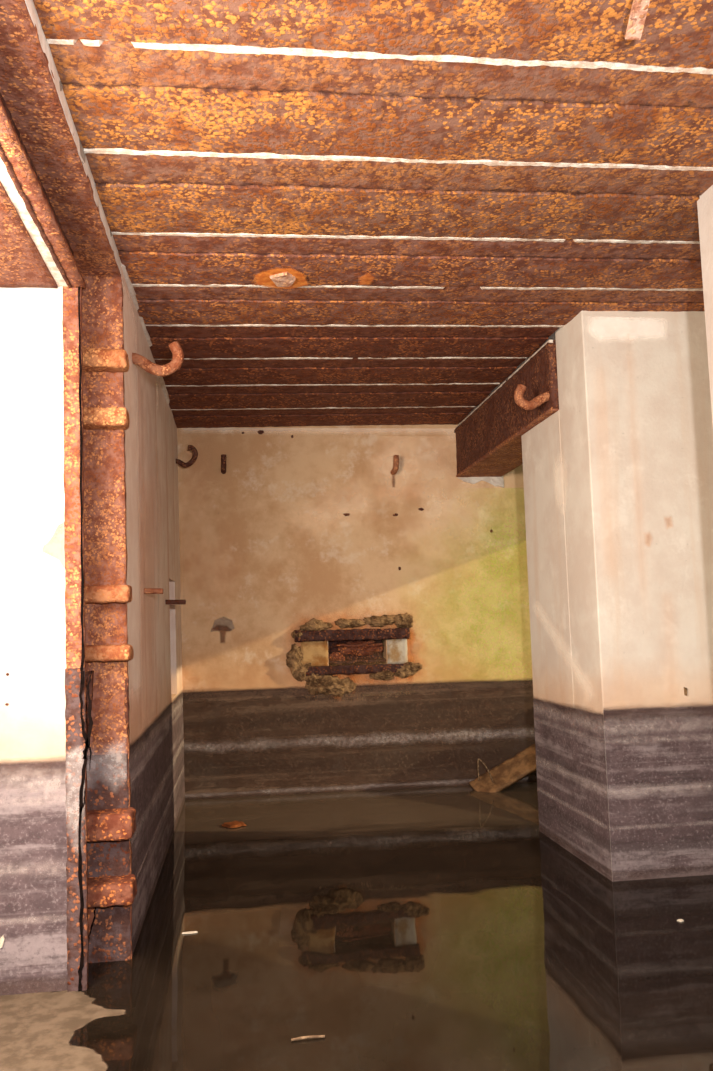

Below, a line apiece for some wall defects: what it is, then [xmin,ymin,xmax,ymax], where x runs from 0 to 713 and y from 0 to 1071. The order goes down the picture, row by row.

corrosion [255,268,308,289]
crack [78,286,93,992]
corrosion [86,670,94,734]